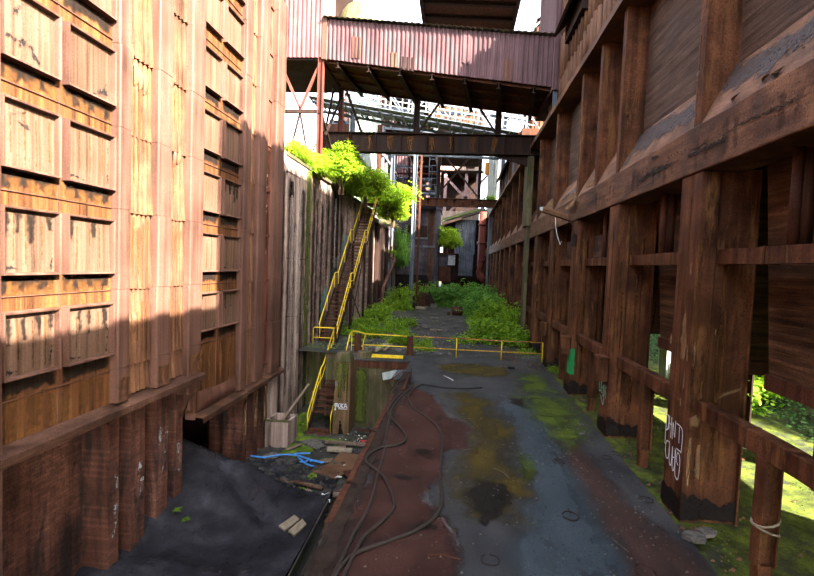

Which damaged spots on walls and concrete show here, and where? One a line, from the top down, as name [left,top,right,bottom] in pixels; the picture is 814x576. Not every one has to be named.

peeling [721,16,814,102]
peeling [623,100,696,166]
damp [499,395,700,576]